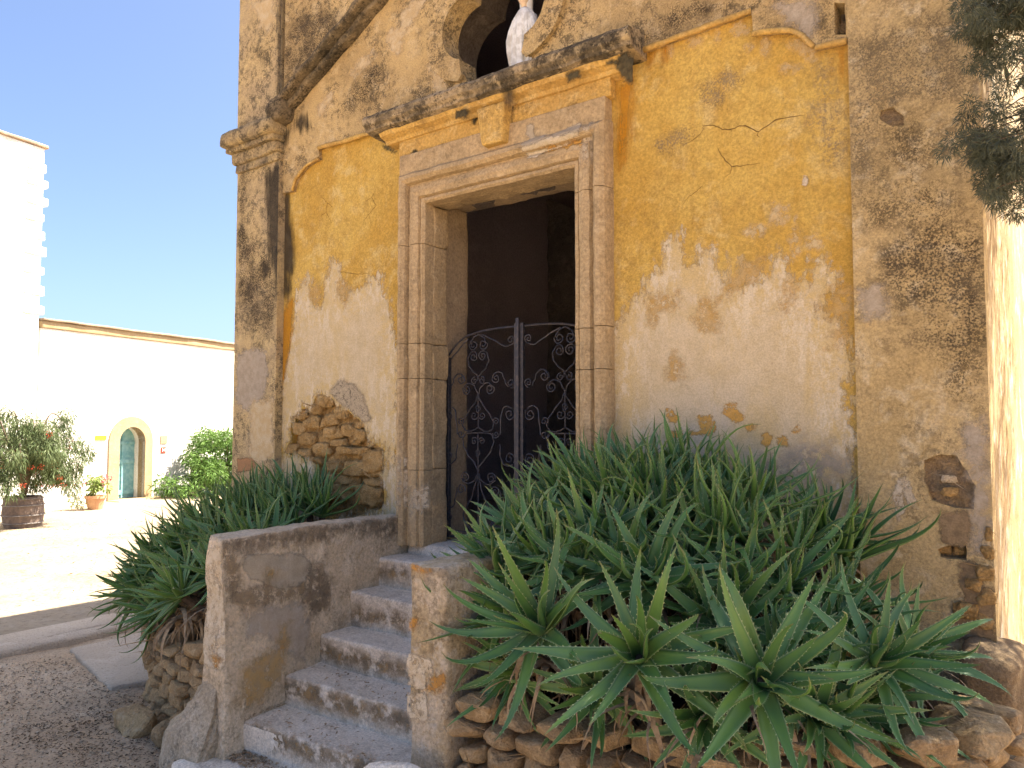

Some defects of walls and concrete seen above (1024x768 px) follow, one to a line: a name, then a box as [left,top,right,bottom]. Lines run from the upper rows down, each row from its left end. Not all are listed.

damp [283,115,308,143]
damp [278,0,337,83]
crack [682,115,803,177]
damp [818,18,963,170]
damp [239,163,293,334]
damp [870,191,985,387]
peeling [237,256,397,522]
peeling [612,204,859,559]
spalling [925,454,999,642]